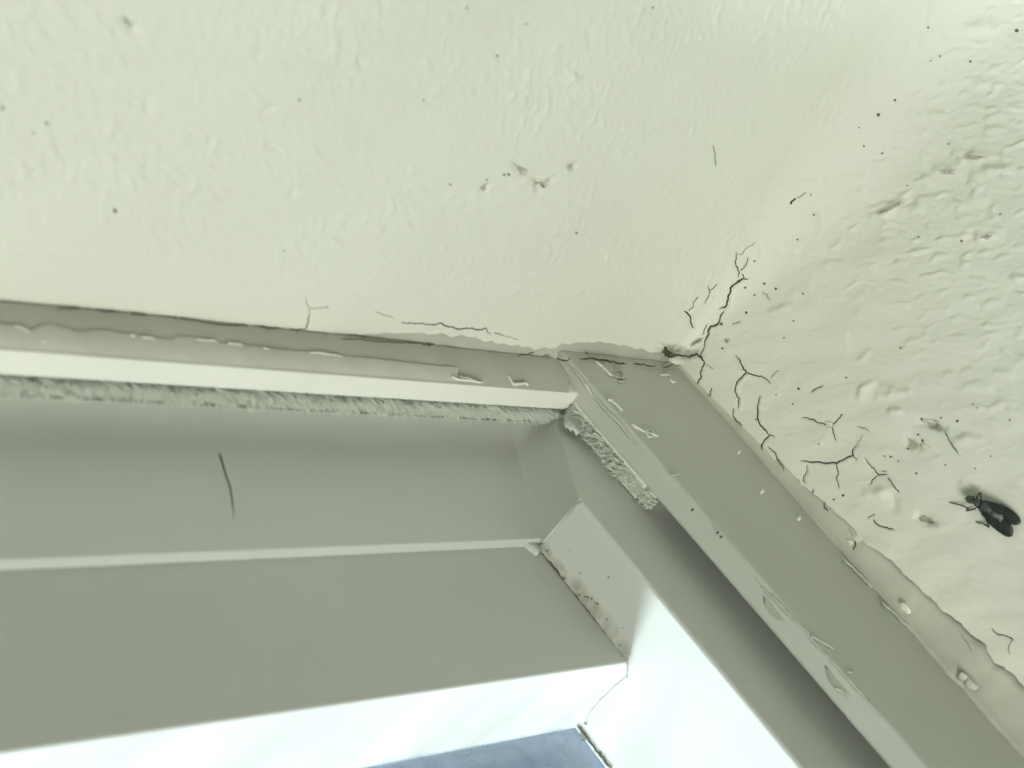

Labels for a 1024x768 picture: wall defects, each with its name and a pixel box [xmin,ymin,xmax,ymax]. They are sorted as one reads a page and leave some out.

peeling [0,323,483,383]
crack [57,242,899,511]
peeling [564,360,659,451]
peeling [825,665,855,699]